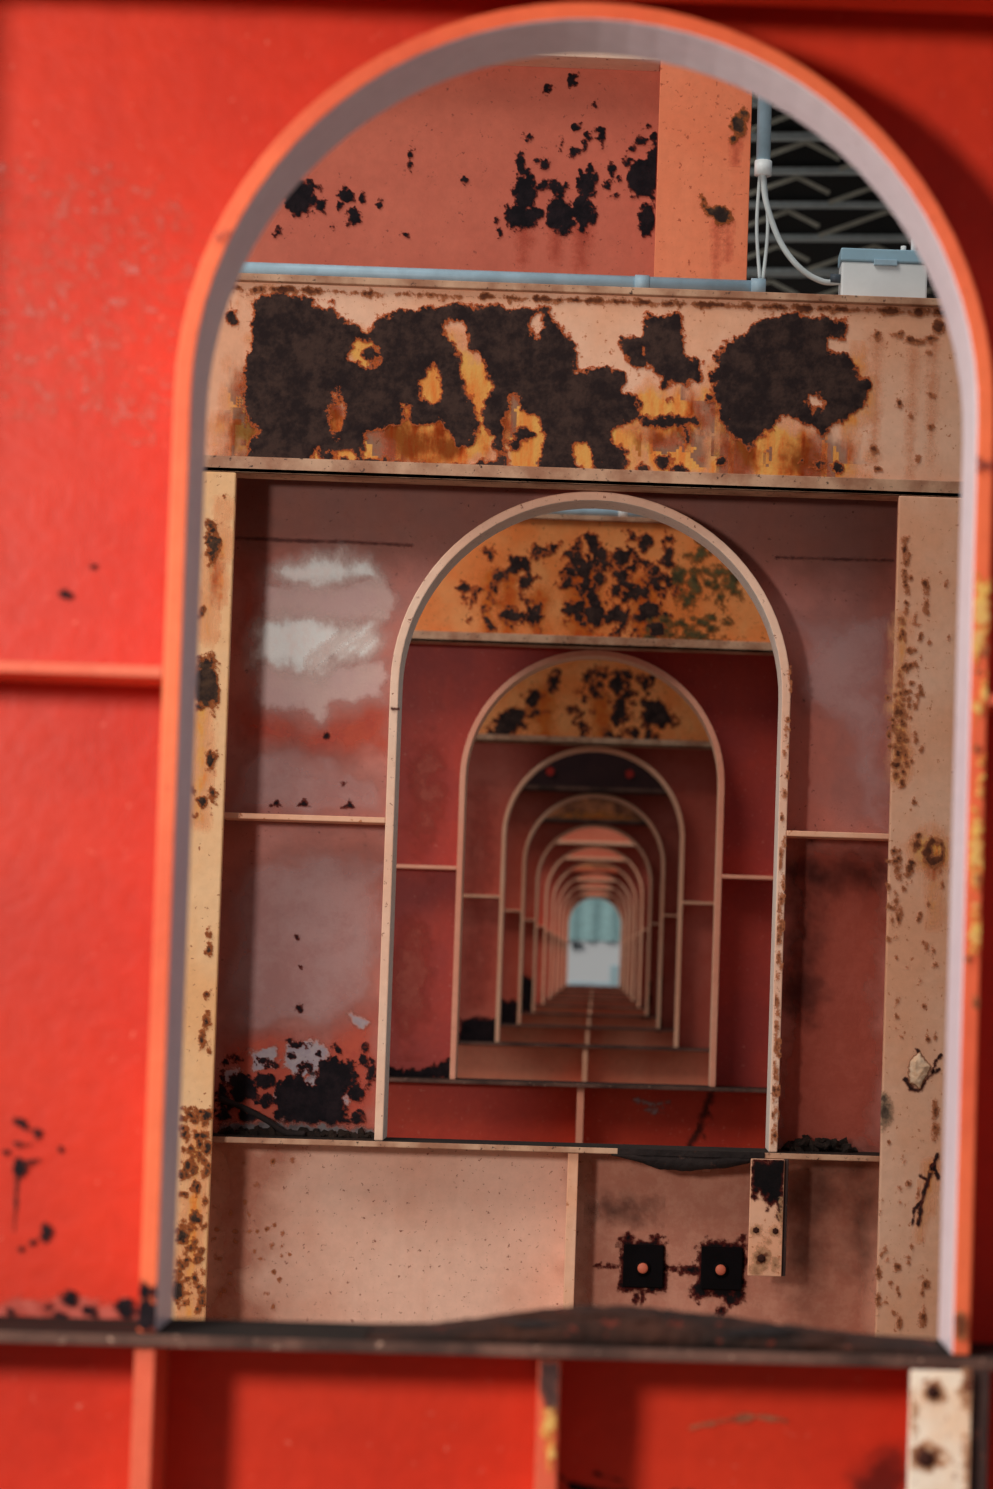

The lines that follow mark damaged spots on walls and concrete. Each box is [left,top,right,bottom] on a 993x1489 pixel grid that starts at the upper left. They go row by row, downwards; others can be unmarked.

corrosion [699,193,734,226]
corrosion [210,285,946,478]
corrosion [454,523,689,639]
corrosion [192,494,228,827]
corrosion [485,662,681,739]
corrosion [885,535,950,805]
corrosion [886,832,951,968]
corrosion [198,991,212,1054]
peeling [214,1010,376,1134]
corrosion [1,1117,53,1252]
corrosion [138,1106,291,1332]
corrosion [909,1368,972,1489]